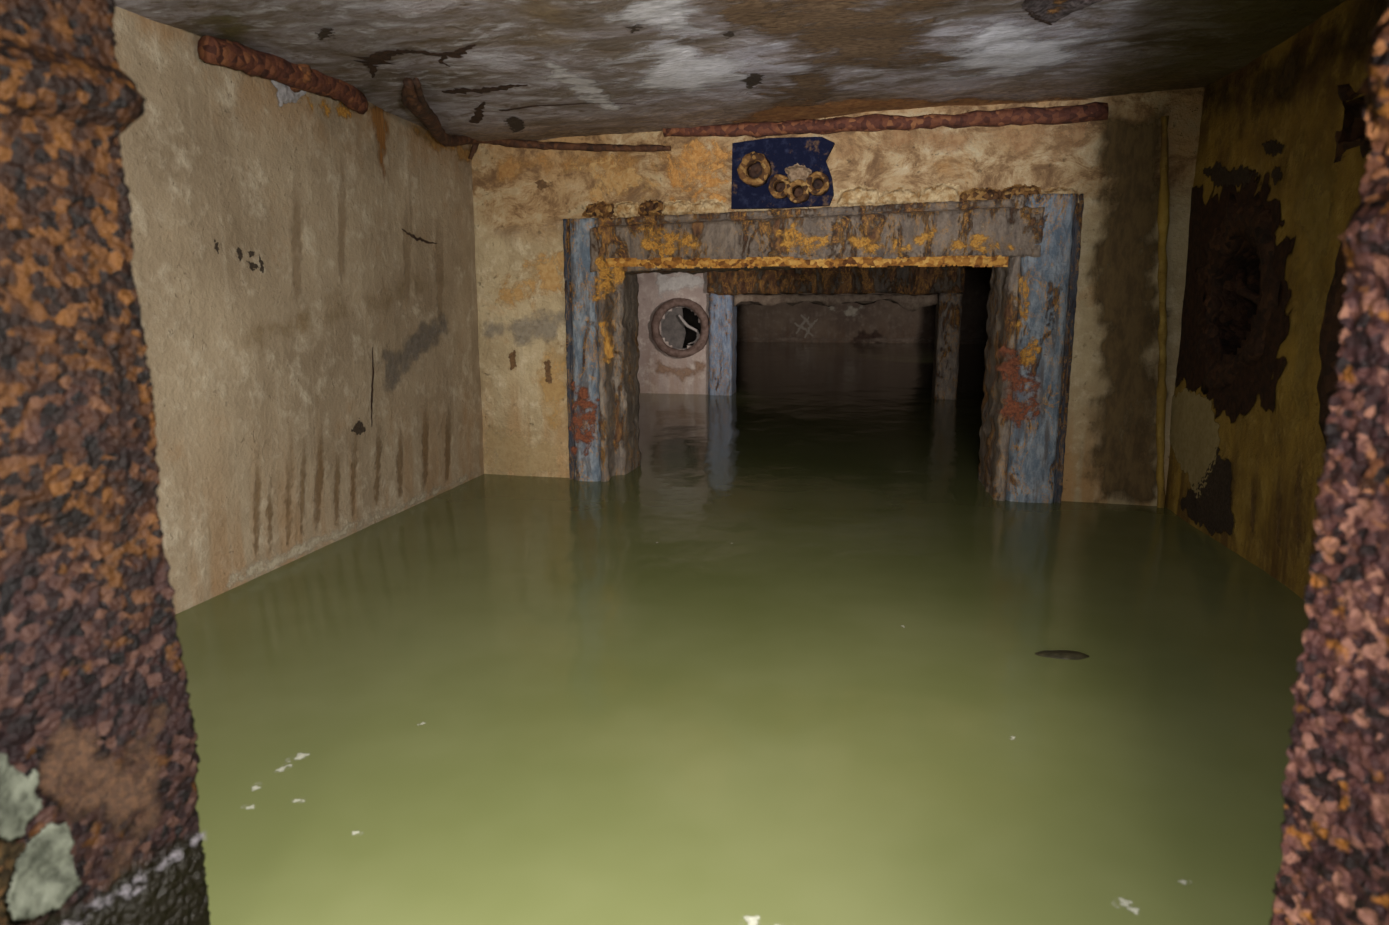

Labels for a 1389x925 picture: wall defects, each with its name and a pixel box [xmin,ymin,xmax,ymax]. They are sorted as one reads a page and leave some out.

spalling [1022,0,1102,25]
rust [369,105,389,174]
crack [352,44,636,124]
rust [734,97,1089,123]
rust [885,130,969,151]
rust [588,223,1045,428]
rust [539,354,600,456]
damp [227,473,472,587]
peeling [0,753,82,925]
rust [38,707,166,876]